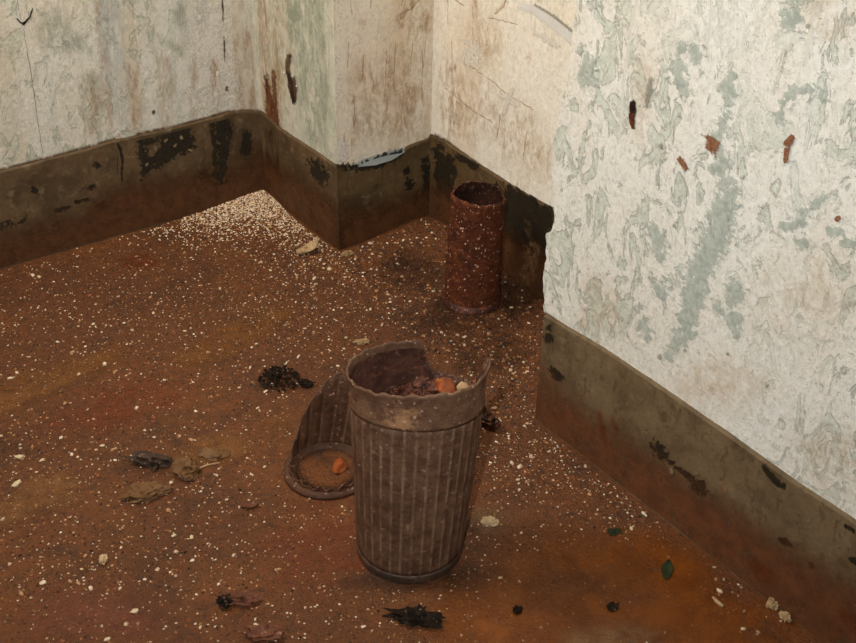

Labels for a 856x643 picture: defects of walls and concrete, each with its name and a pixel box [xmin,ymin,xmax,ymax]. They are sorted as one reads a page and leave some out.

rust [263,70,280,126]
rust [701,134,720,158]
rust [783,134,795,164]